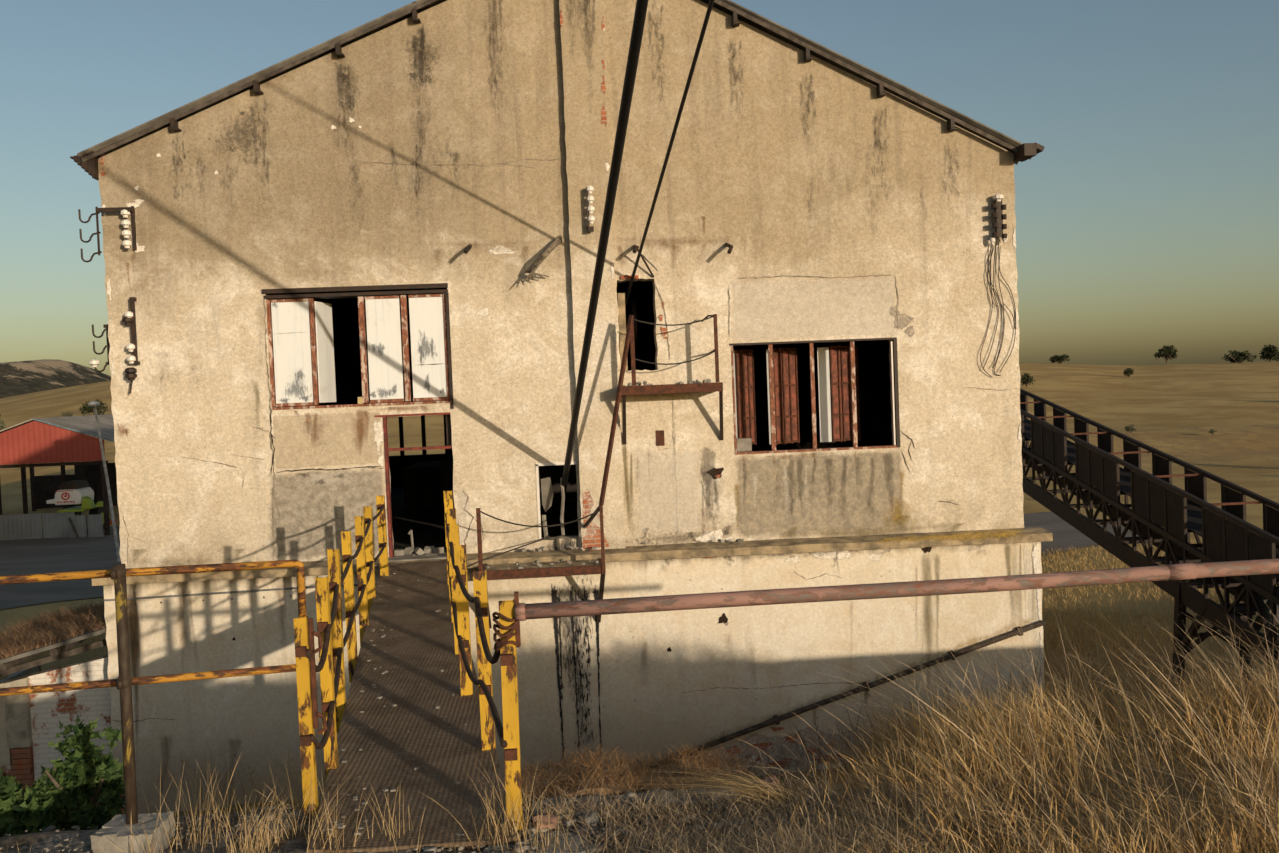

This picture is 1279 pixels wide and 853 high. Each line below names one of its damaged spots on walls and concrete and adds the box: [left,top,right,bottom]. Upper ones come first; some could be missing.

crack [362,159,559,168]
damp [551,575,599,602]
damp [553,615,602,772]
spalling [685,727,865,778]